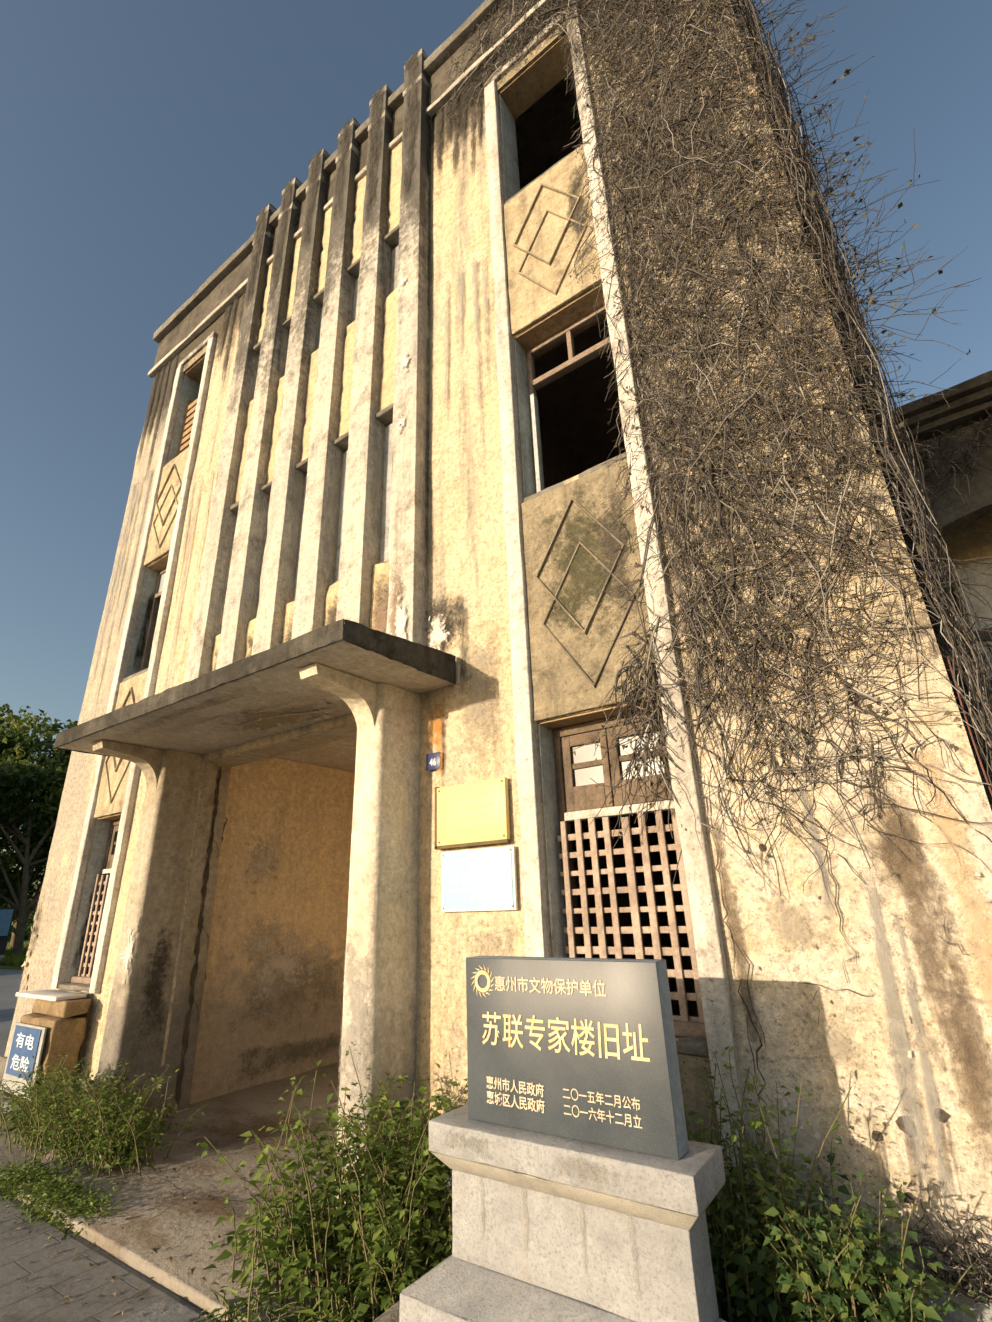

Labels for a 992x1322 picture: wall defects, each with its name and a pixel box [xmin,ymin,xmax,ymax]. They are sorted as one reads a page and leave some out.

crack [175,766,228,1104]
water stain [868,779,992,1198]